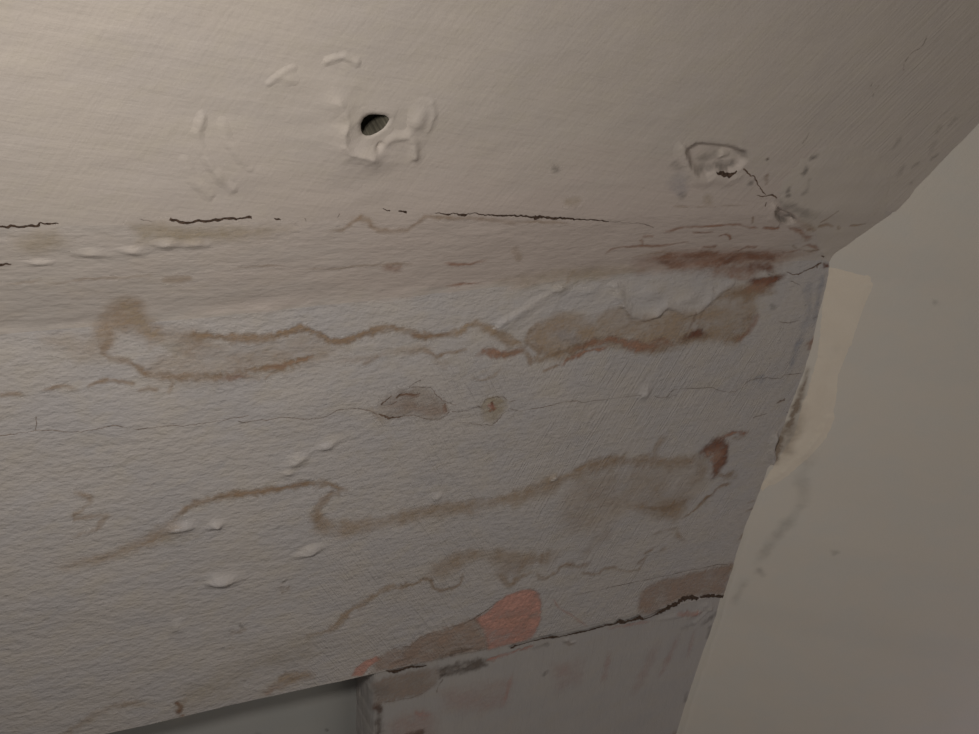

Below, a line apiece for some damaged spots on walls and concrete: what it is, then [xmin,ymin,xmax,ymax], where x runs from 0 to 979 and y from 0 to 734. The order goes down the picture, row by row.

crack [743,168,777,206]
crack [0,221,59,229]
crack [141,216,281,224]
crack [436,213,652,227]
water stain [193,325,398,344]
water stain [483,340,523,358]
peeling [761,267,873,491]
crack [0,408,378,436]
water stain [214,481,310,499]
crack [510,594,724,649]
crack [386,665,427,673]